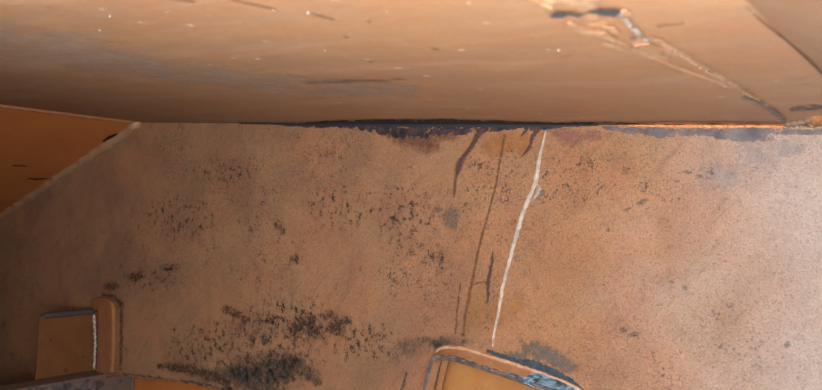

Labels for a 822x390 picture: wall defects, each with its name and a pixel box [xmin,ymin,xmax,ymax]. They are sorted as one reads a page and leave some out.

crack [550,8,672,60]
corrosion [455,134,505,342]